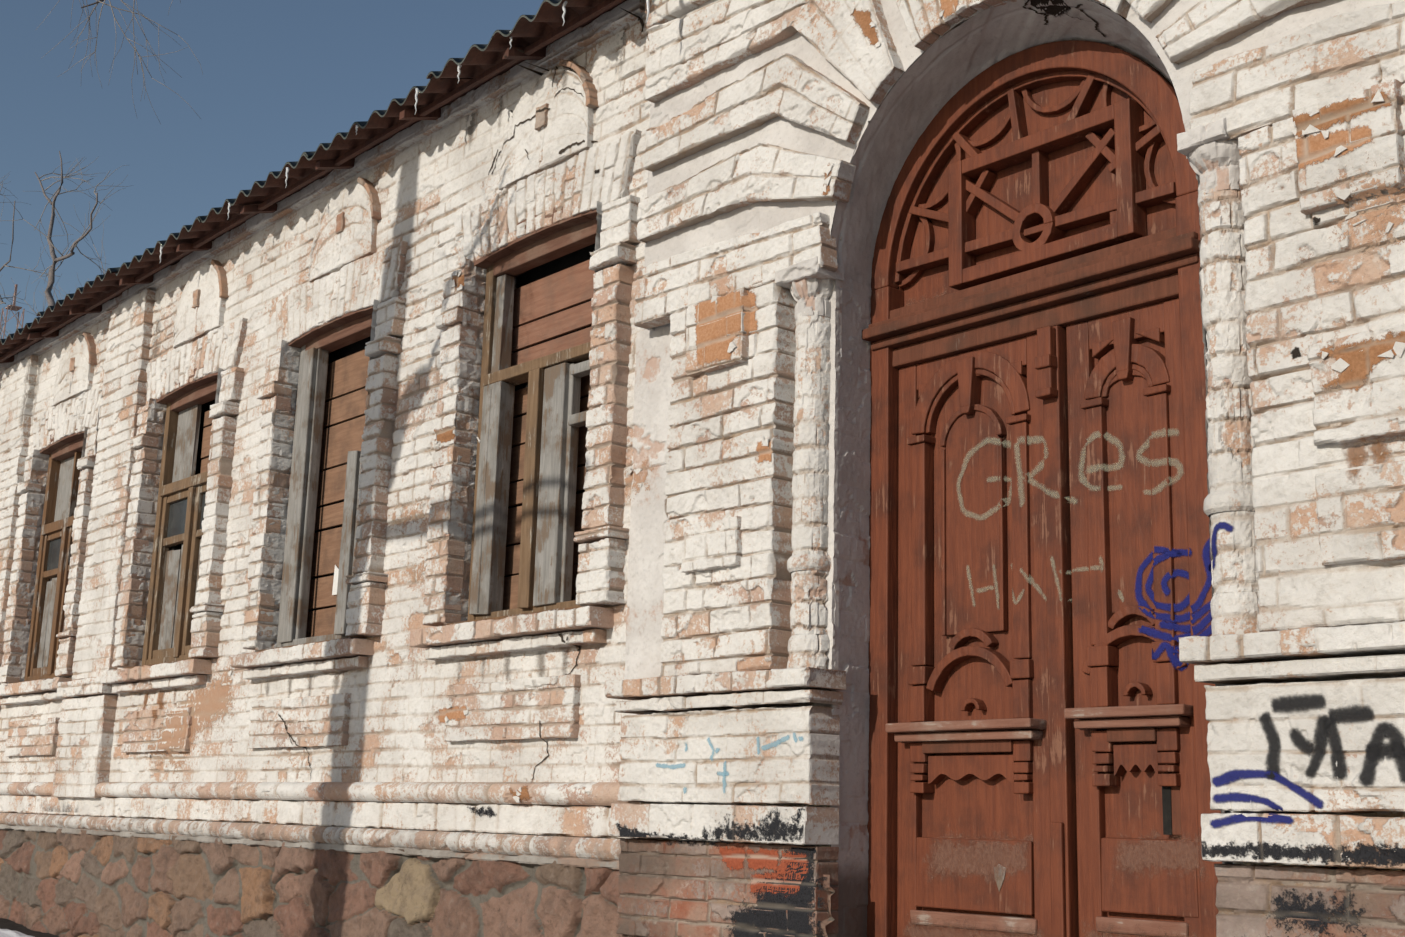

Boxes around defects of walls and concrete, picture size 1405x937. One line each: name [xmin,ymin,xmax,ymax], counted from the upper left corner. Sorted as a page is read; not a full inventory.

spalling [850,7,881,48]
spalling [939,0,981,19]
crack [1023,2,1107,38]
spalling [1292,89,1405,254]
spalling [695,290,759,367]
spalling [1317,330,1405,391]
crack [278,714,311,779]
crack [532,720,549,780]
spalling [718,846,809,896]